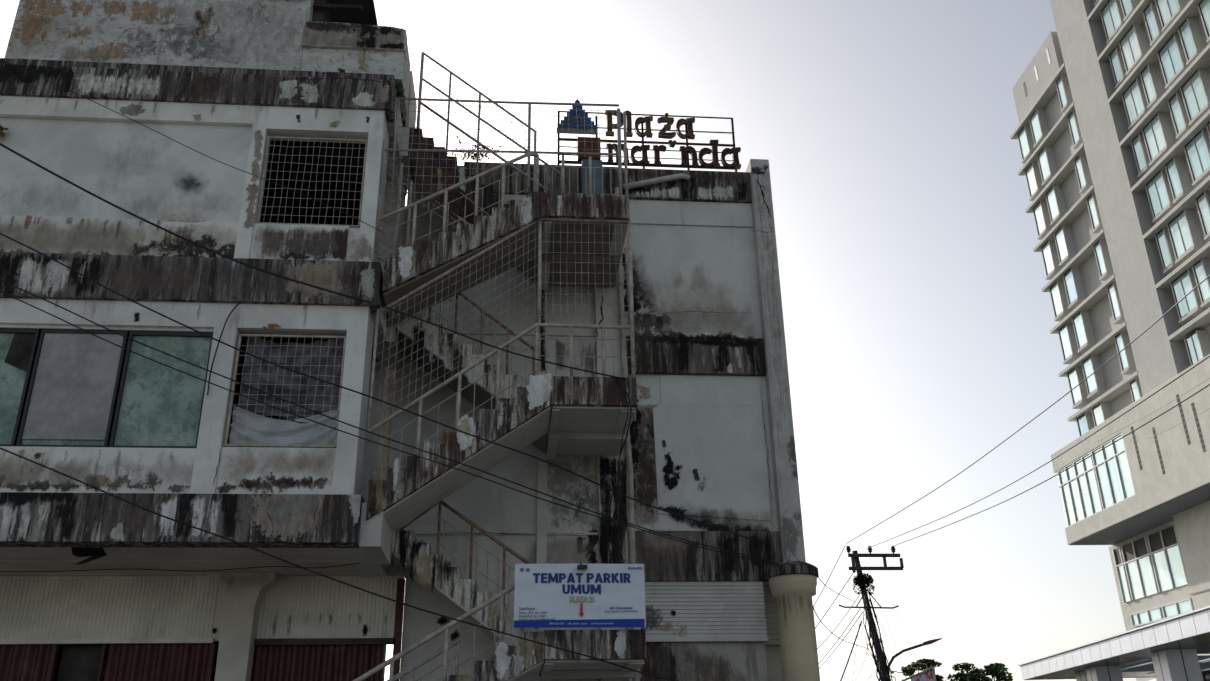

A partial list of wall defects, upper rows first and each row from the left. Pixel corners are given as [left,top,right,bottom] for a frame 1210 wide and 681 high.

peeling [15,0,177,99]
spalling [279,79,319,103]
water stain [0,228,374,300]
water stain [622,252,671,372]
peeling [526,373,553,410]
peeling [456,409,484,451]
water stain [0,452,164,541]
water stain [219,441,430,542]
water stain [577,378,773,579]
water stain [391,530,452,592]
peeling [493,641,526,679]
water stain [626,606,745,681]